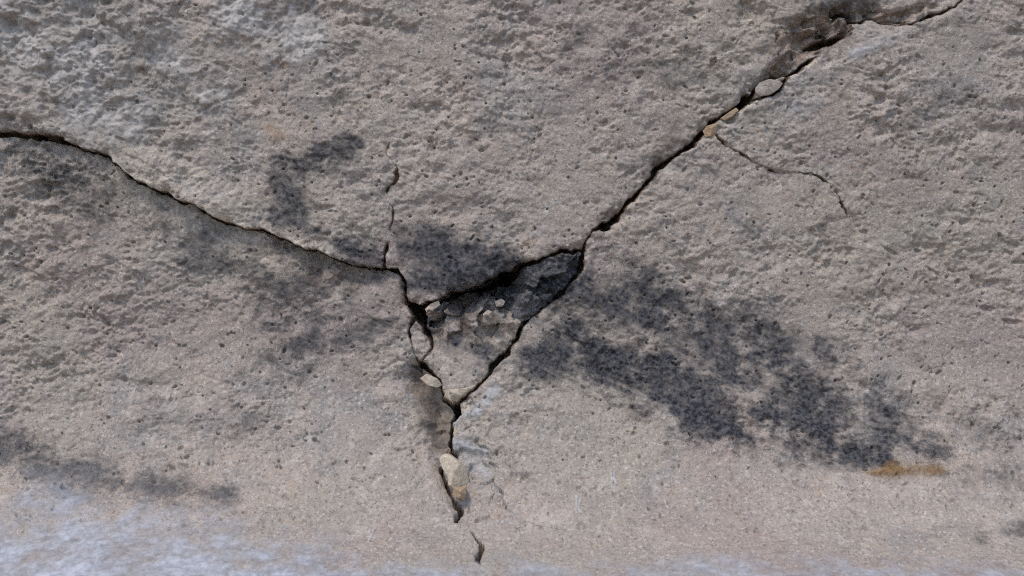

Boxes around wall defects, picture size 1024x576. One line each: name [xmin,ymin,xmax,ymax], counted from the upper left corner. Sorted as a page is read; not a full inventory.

crack [0,0,963,459]
damp [520,327,752,447]
crack [440,469,464,523]
damp [771,424,892,467]
corrosion [870,464,946,476]
crack [471,533,484,565]